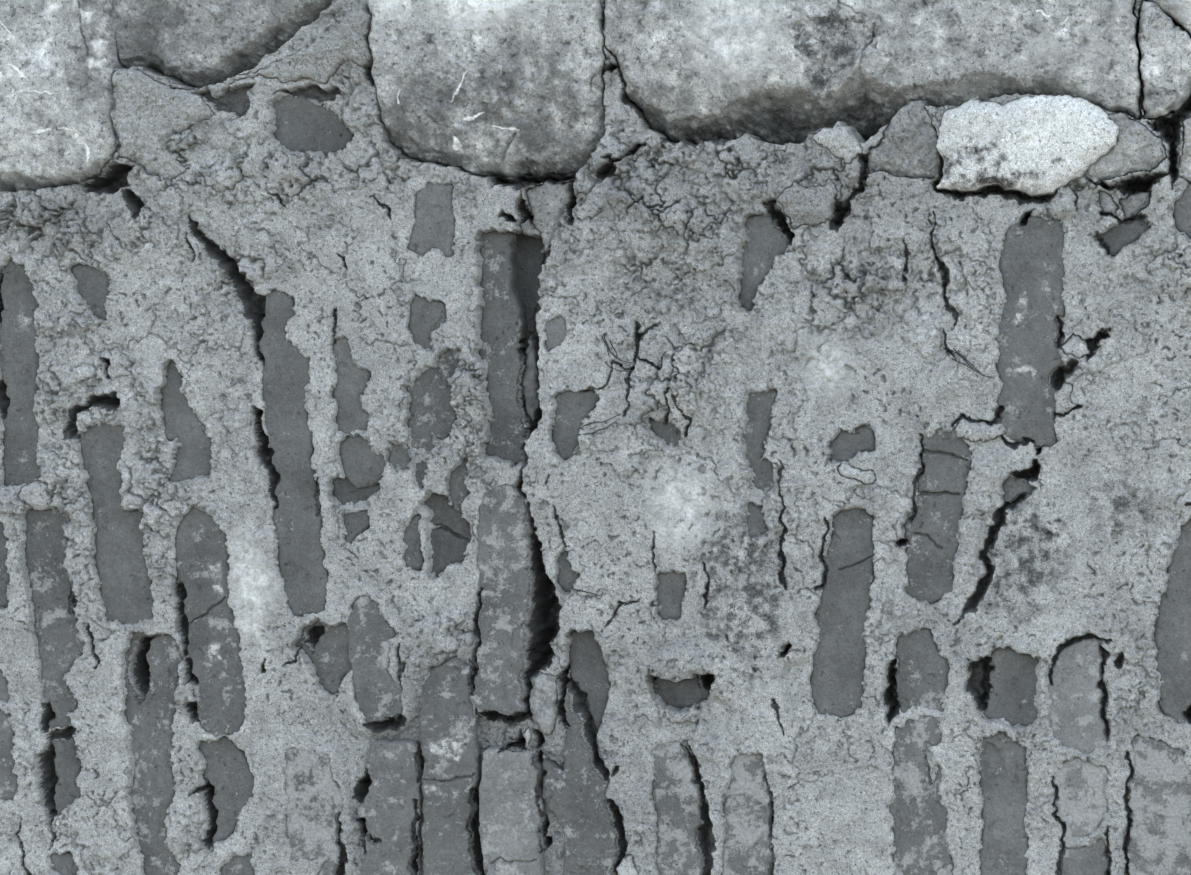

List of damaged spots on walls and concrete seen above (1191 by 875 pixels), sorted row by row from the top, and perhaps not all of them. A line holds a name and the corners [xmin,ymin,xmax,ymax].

crack [482,133,577,265]
spalling [829,154,870,233]
crack [185,215,266,363]
spalling [63,358,120,440]
crack [585,321,693,437]
spalling [1050,316,1111,391]
crack [517,307,628,875]
crack [953,493,1029,626]
spalling [882,659,901,726]
spalling [966,656,995,711]
spalling [37,702,76,826]
crack [685,745,717,875]